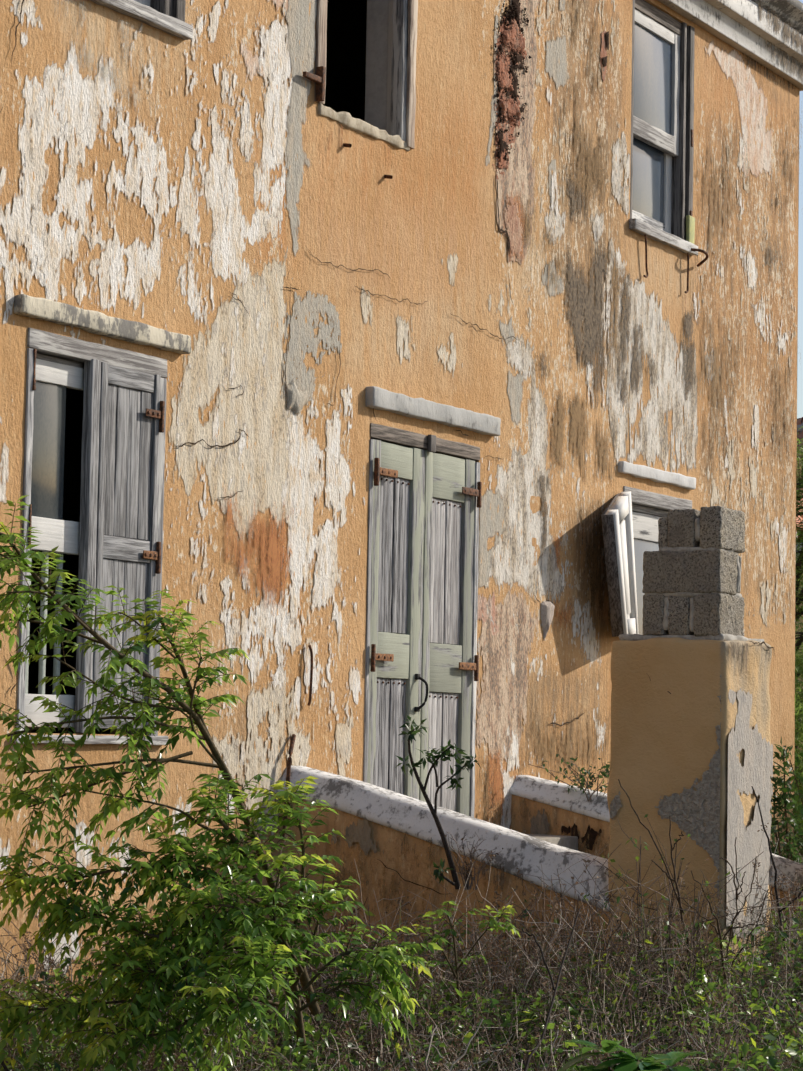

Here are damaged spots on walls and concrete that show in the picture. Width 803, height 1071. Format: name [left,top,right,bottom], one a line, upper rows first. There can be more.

crack [11,0,24,67]
water stain [742,1,803,91]
crack [284,249,427,392]
crack [450,313,517,340]
water stain [520,0,656,556]
water stain [681,126,746,471]
peeling [0,0,365,840]
crack [179,429,249,448]
peeling [476,0,796,829]
rust [224,496,291,604]
peeling [72,821,135,890]
peeling [655,688,773,938]